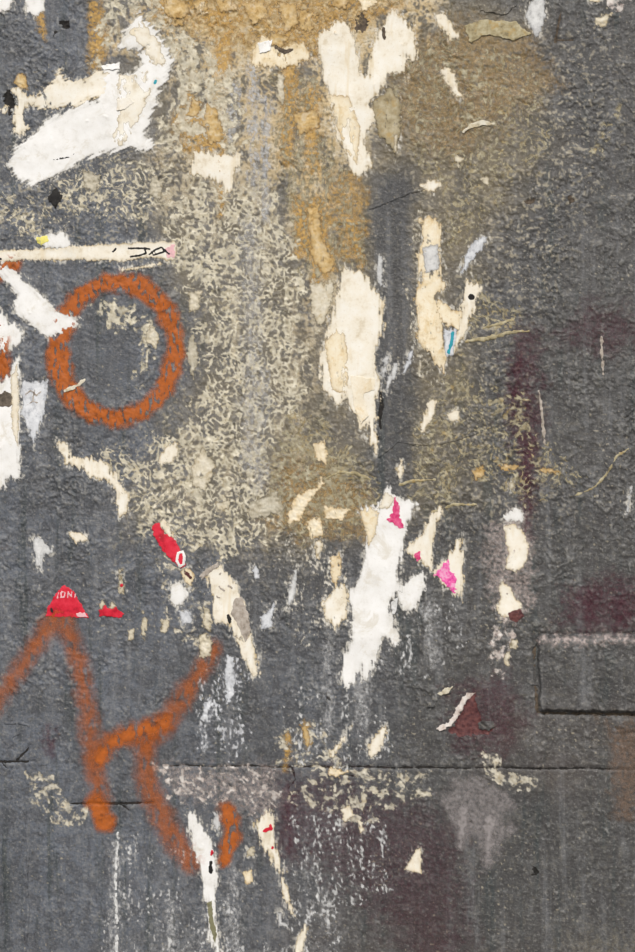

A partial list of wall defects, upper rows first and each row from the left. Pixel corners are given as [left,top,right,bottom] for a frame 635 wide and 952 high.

crack [0,747,29,768]